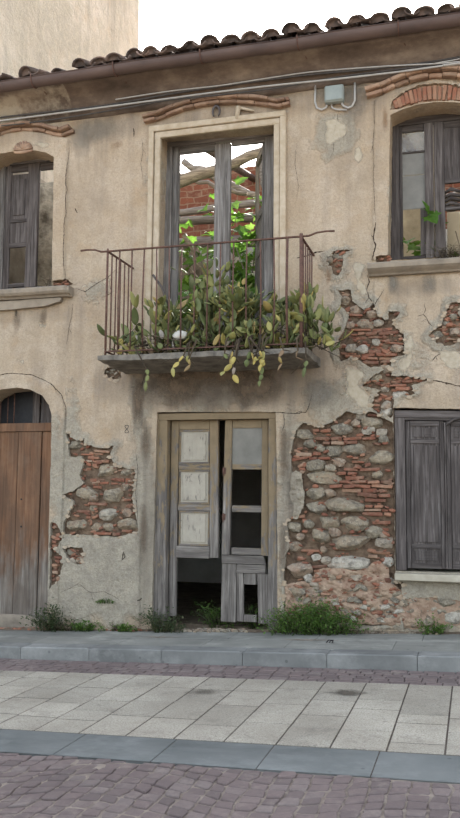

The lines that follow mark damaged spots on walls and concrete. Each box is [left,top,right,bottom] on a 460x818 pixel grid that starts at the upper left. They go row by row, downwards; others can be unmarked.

peeling [325,119,346,144]
spalling [51,431,138,586]
spalling [281,247,460,632]